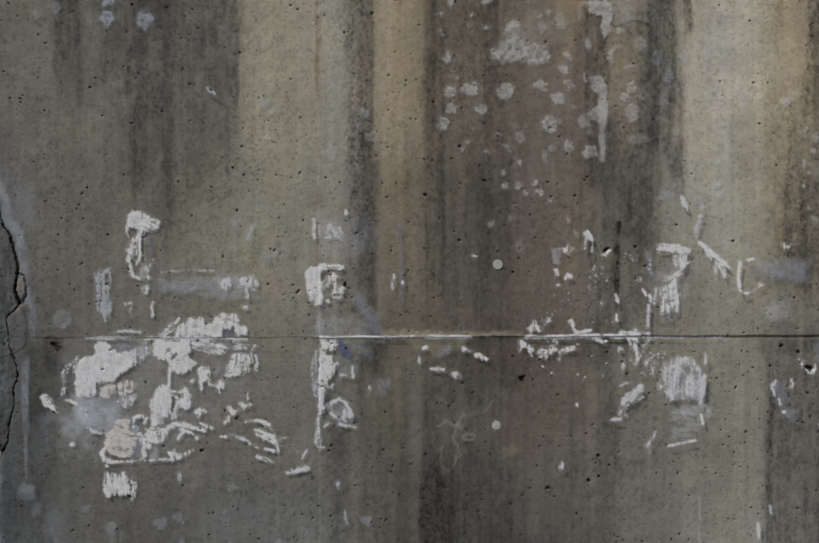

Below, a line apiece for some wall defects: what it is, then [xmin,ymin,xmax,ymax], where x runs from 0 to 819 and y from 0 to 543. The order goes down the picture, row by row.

crack [0,211,27,457]
leakage [100,0,183,205]
peeling [126,211,160,294]
peeling [43,277,259,498]
peeling [220,419,286,463]
peeling [305,263,346,306]
peeling [311,329,507,448]
leakage [418,403,512,543]
leakage [422,0,559,386]
peeling [519,314,675,400]
leakage [534,0,685,308]
leakage [778,0,819,293]